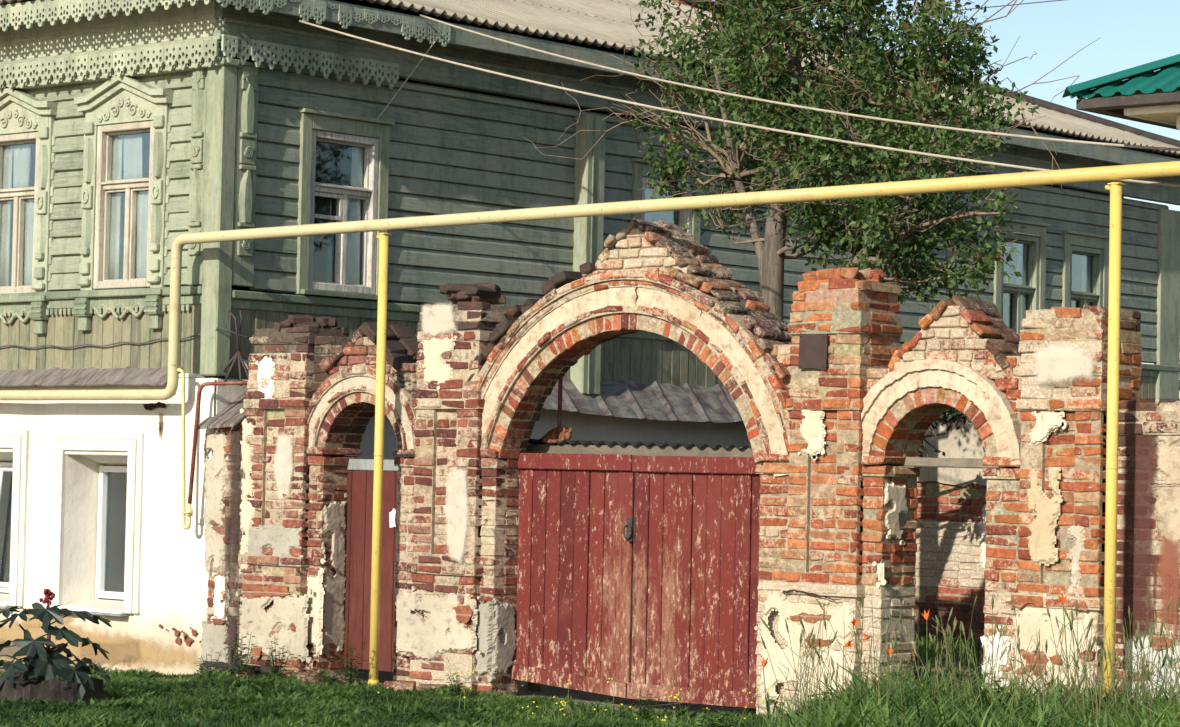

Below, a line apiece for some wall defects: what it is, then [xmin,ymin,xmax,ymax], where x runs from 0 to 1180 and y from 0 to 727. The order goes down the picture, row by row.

damp [1127,400,1156,411]
damp [1119,435,1157,645]
spalling [235,584,290,597]
spalling [453,596,481,624]
spalling [1005,593,1048,610]
spalling [1068,586,1088,612]
peeling [159,624,202,646]
spalling [1080,646,1100,662]